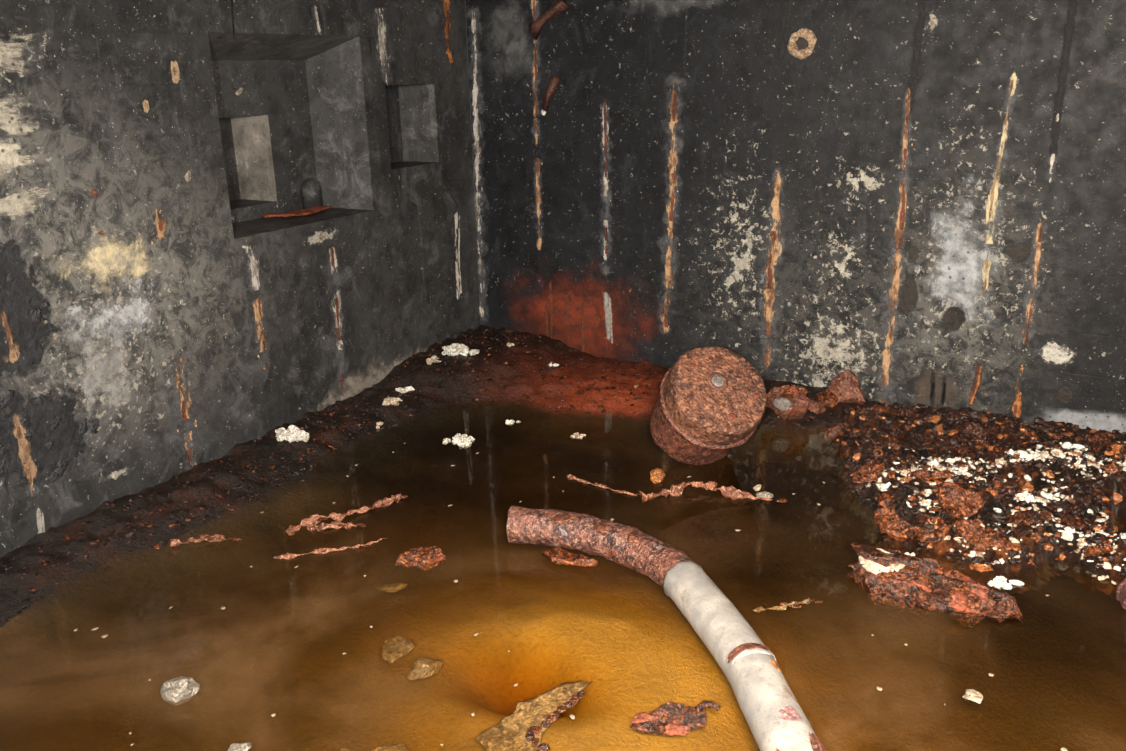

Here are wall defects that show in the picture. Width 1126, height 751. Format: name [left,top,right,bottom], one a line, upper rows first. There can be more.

leakage [898,246,919,314]
leakage [931,191,990,331]
leakage [1004,243,1036,262]
corrosion [516,282,625,356]
corrosion [13,413,37,496]